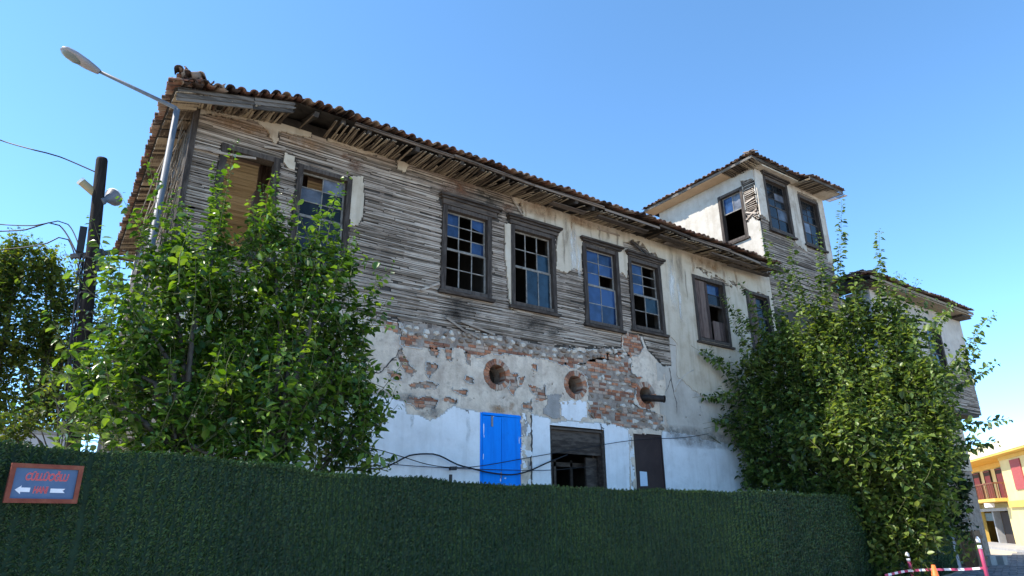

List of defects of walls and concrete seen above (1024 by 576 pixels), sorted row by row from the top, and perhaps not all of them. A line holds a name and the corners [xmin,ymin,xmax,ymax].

flaking render [369,316,733,490]